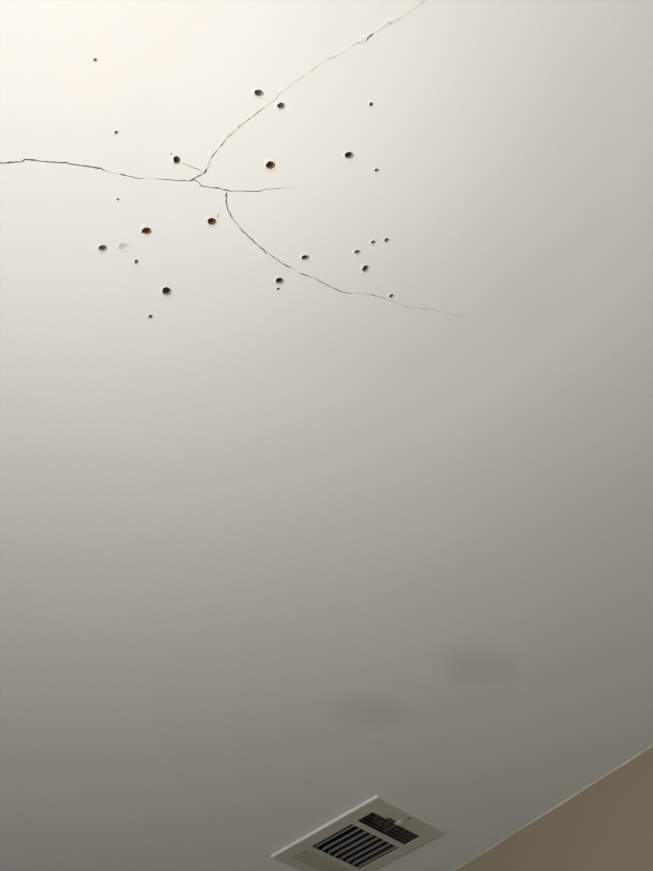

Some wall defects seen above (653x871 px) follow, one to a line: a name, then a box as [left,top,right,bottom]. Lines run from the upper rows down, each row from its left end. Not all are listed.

crack [0,0,467,318]